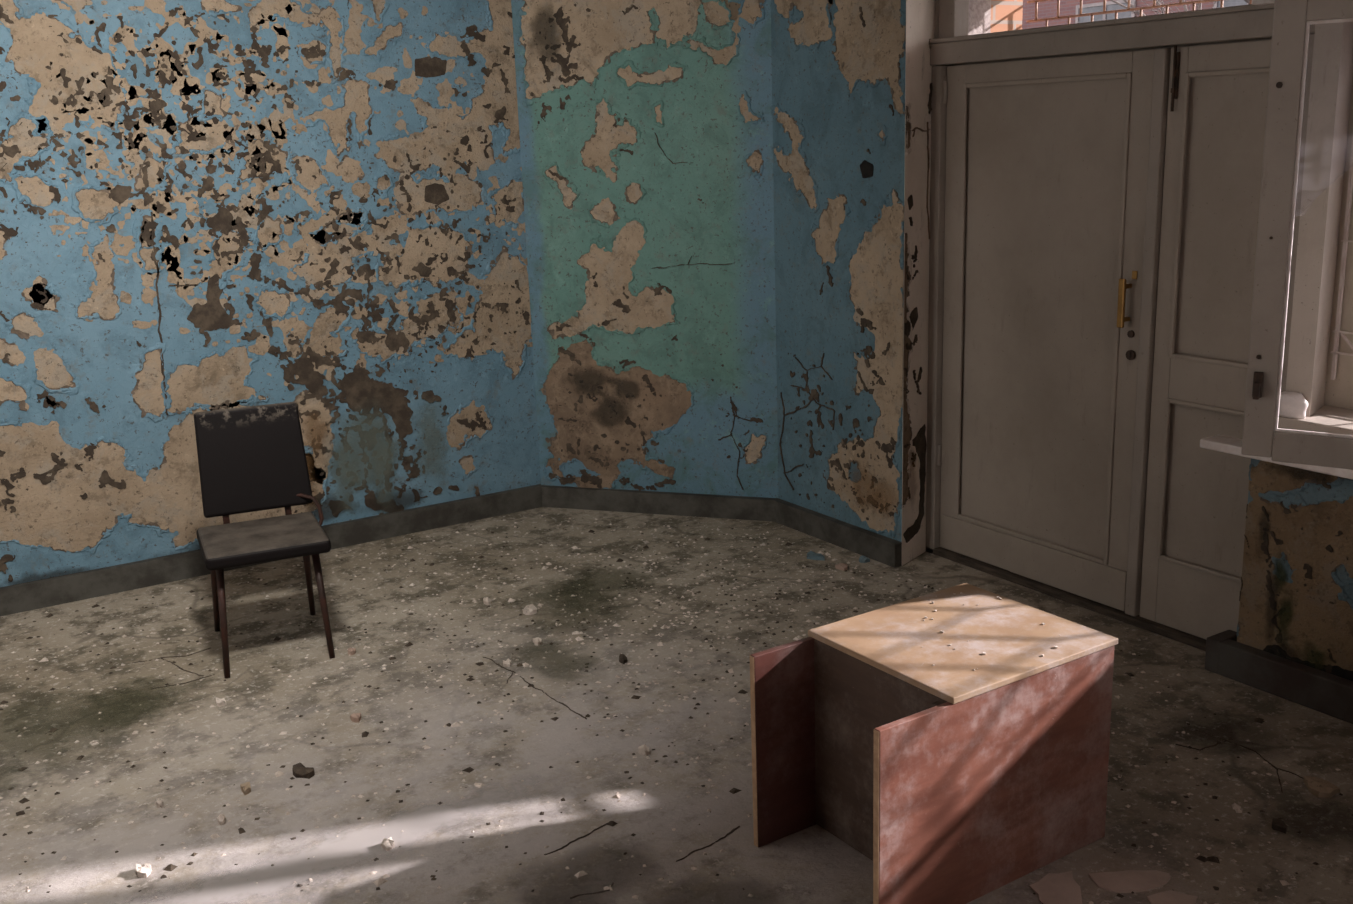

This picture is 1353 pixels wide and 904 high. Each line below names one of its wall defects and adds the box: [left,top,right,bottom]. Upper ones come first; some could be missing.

peeling [0,0,927,582]
peeling [1236,460,1353,671]